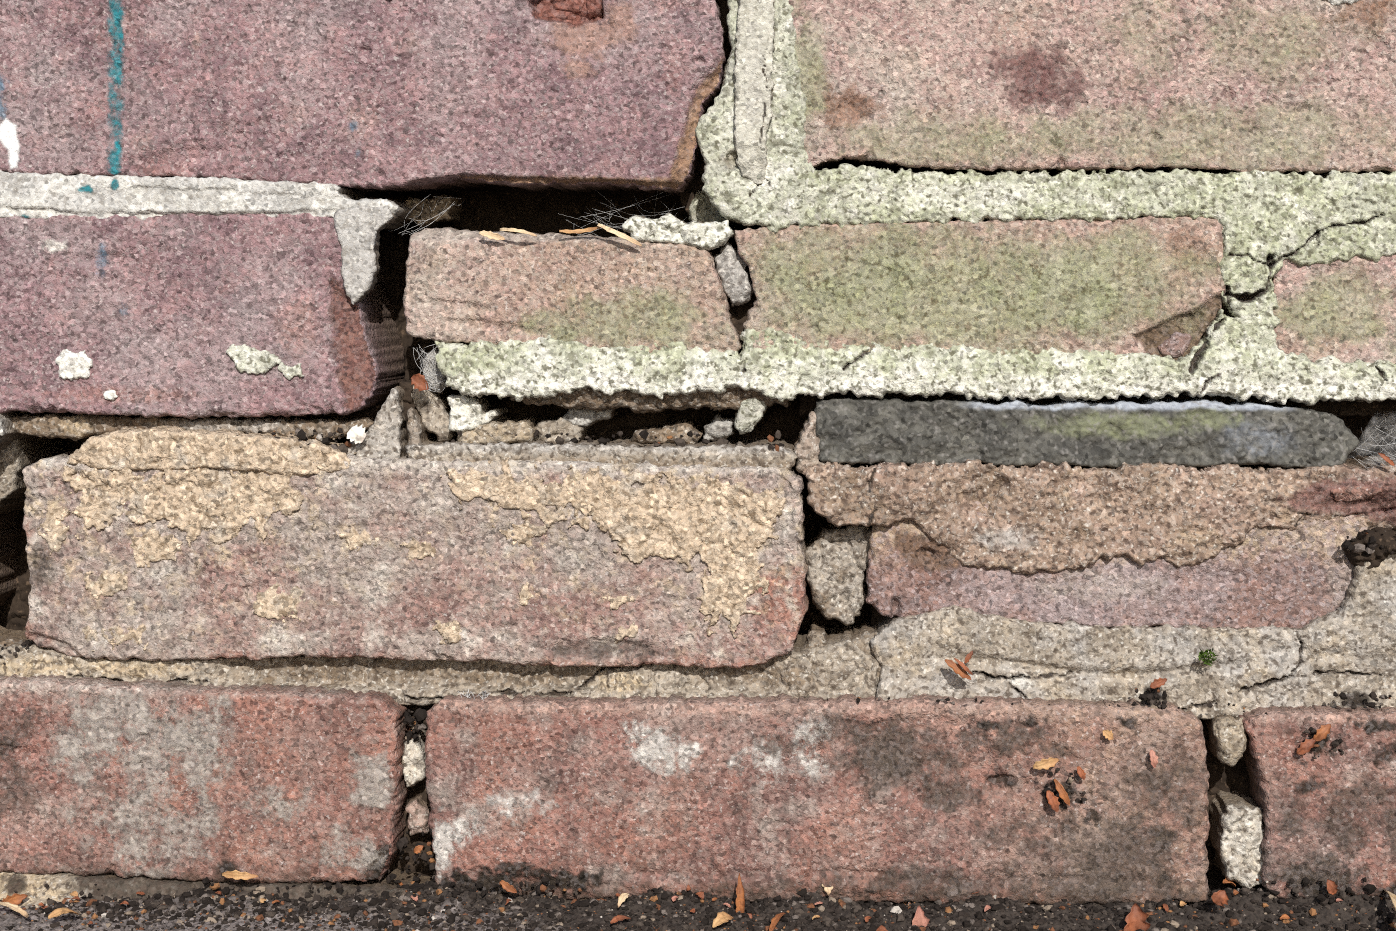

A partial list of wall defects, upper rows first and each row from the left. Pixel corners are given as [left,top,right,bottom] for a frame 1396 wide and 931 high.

peeling [364,61,723,381]
crack [798,213,1396,418]
peeling [482,394,569,422]
peeling [0,278,380,631]
peeling [587,394,832,542]
spalling [1290,480,1396,523]
peeling [400,531,436,561]
peeling [440,457,786,644]
spalling [895,531,959,572]
peeling [800,581,871,633]
crack [968,671,1080,698]
crack [1182,631,1381,710]